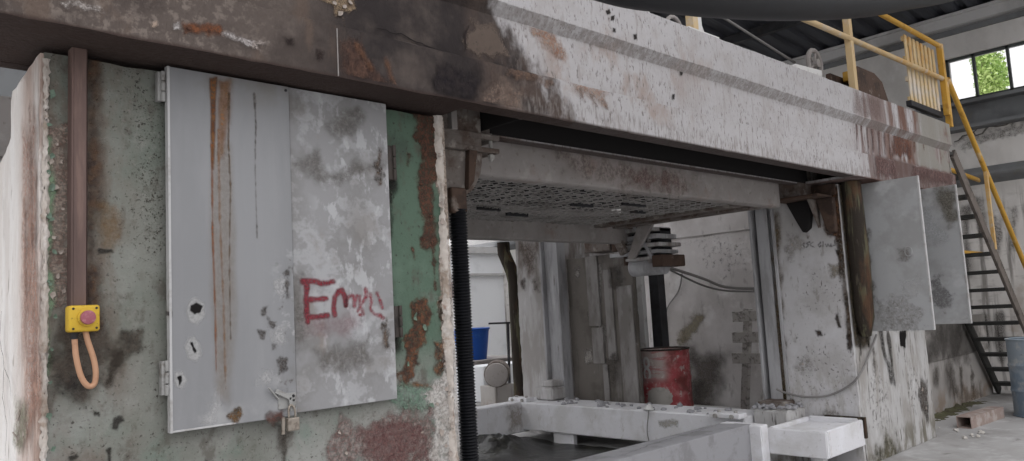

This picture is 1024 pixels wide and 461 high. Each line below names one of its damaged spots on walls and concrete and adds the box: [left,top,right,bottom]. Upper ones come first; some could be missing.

rust [183,23,223,34]
peeling [12,58,68,461]
rust [210,77,231,301]
spalling [326,115,460,461]
rust [856,124,953,185]
leakage [928,324,974,394]